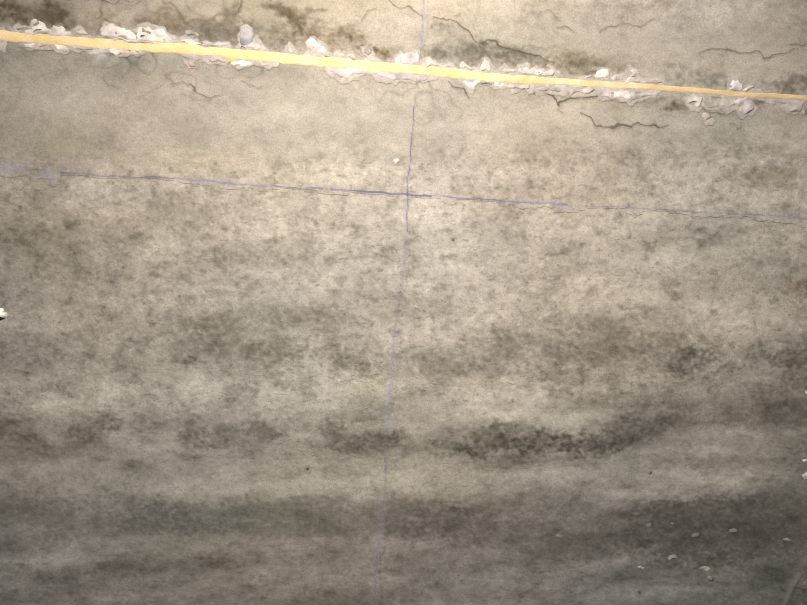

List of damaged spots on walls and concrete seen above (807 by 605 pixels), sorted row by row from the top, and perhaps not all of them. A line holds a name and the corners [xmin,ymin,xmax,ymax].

crack [96,0,130,21]
crack [361,0,556,64]
damp [412,12,636,79]
crack [539,9,576,33]
crack [598,18,657,33]
crack [698,42,807,60]
crack [164,72,223,99]
crack [448,80,470,100]
damp [641,58,807,117]
crack [532,93,670,131]
crack [695,101,743,131]
damp [0,301,807,473]